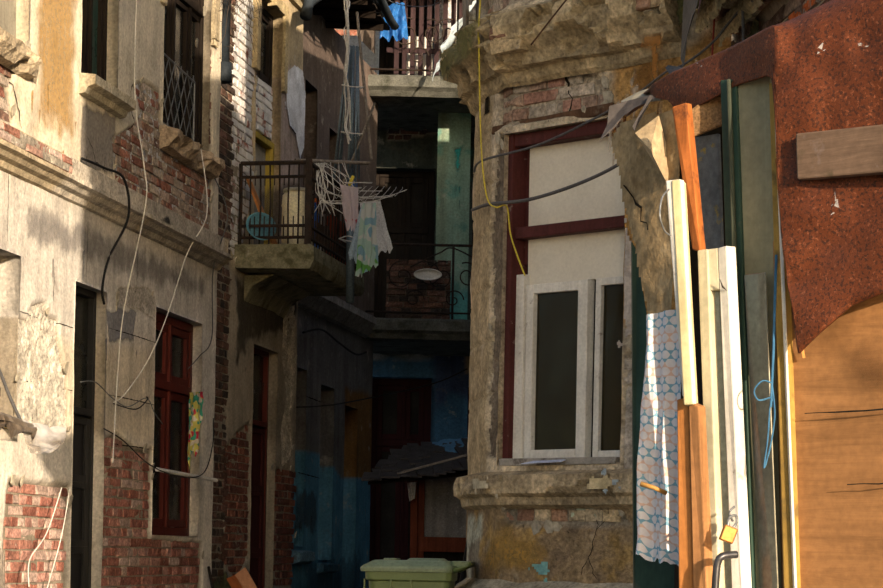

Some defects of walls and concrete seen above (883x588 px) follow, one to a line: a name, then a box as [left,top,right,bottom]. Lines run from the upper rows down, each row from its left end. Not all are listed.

flaking render [487,0,529,56]
flaking render [753,0,831,32]
flaking render [0,64,73,174]
flaking render [101,0,258,588]
flaking render [3,474,73,588]
peeling [528,562,550,582]